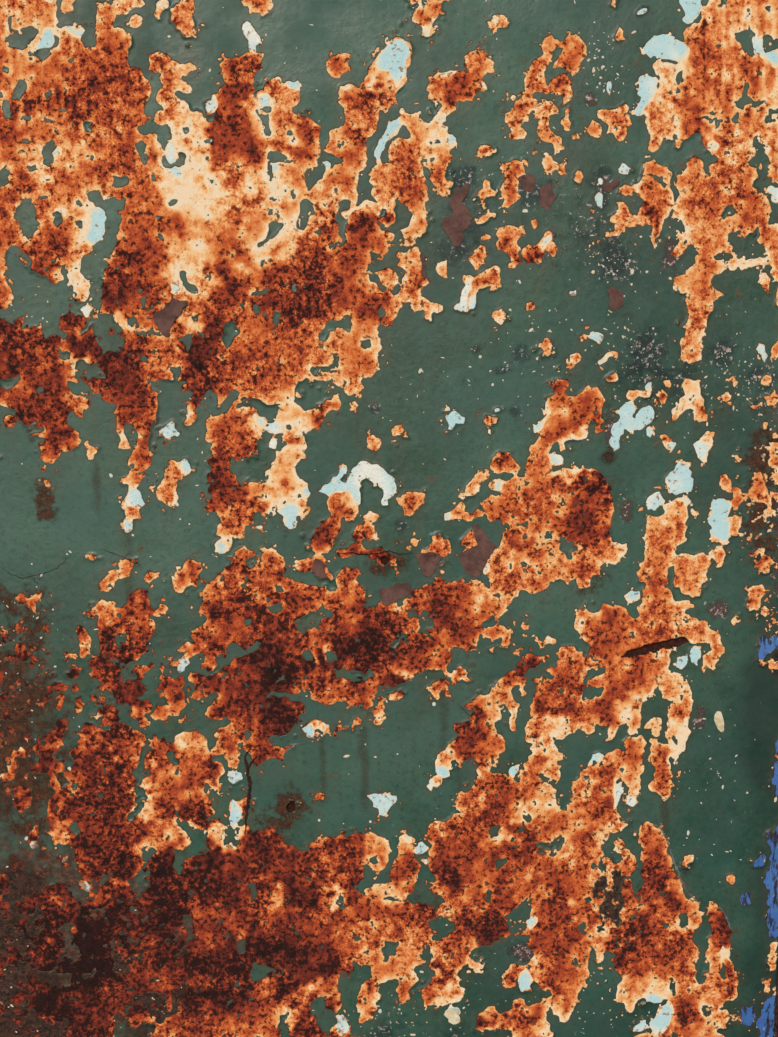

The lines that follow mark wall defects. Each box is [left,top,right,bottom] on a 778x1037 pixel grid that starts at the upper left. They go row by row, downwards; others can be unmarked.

corrosion [454,0,778,364]
peeling [609,382,655,451]